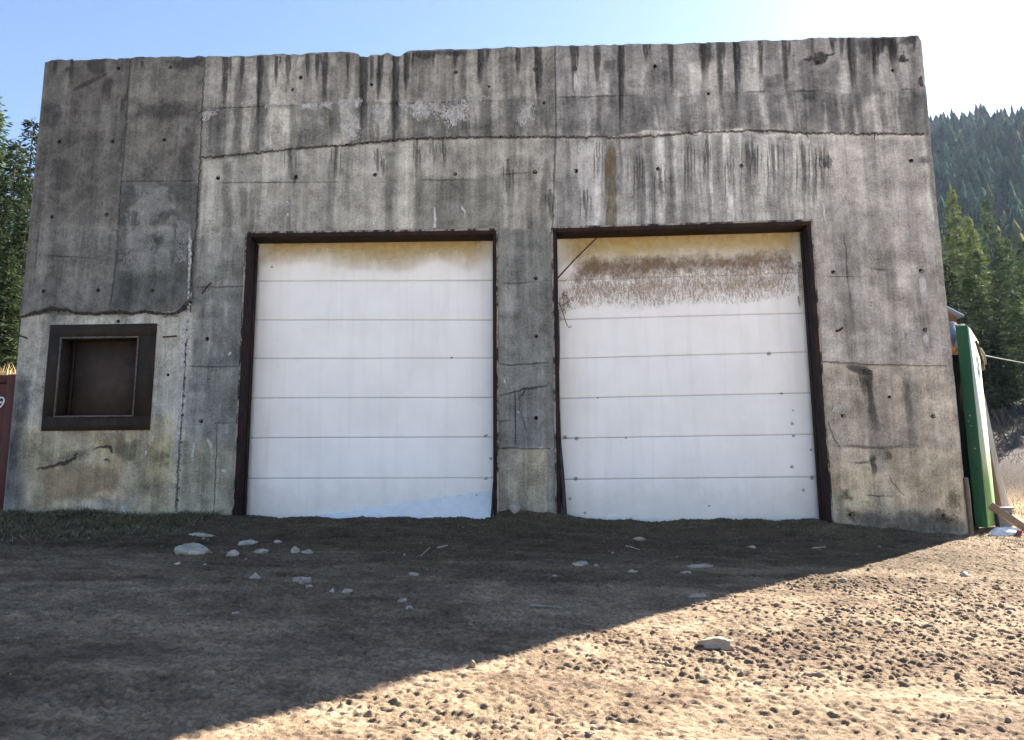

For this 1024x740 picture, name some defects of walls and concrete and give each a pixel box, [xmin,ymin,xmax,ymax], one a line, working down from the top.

damp [53,59,111,95]
damp [173,58,201,69]
damp [222,55,291,111]
damp [298,49,492,163]
damp [516,47,542,130]
damp [570,46,581,93]
damp [699,42,741,87]
damp [782,40,791,73]
damp [830,36,916,78]
crack [175,46,925,512]
damp [848,365,876,418]